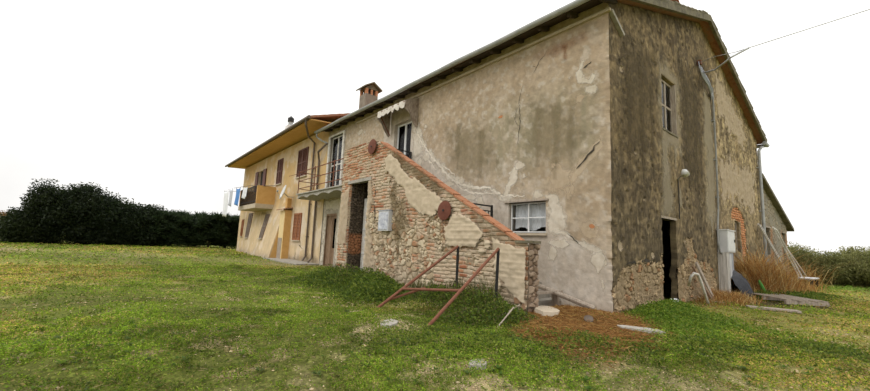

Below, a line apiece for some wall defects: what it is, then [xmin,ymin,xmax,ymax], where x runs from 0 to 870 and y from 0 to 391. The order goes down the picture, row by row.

peeling [569,60,597,102]
peeling [363,180,386,273]
peeling [384,154,442,216]
spalling [411,124,664,313]